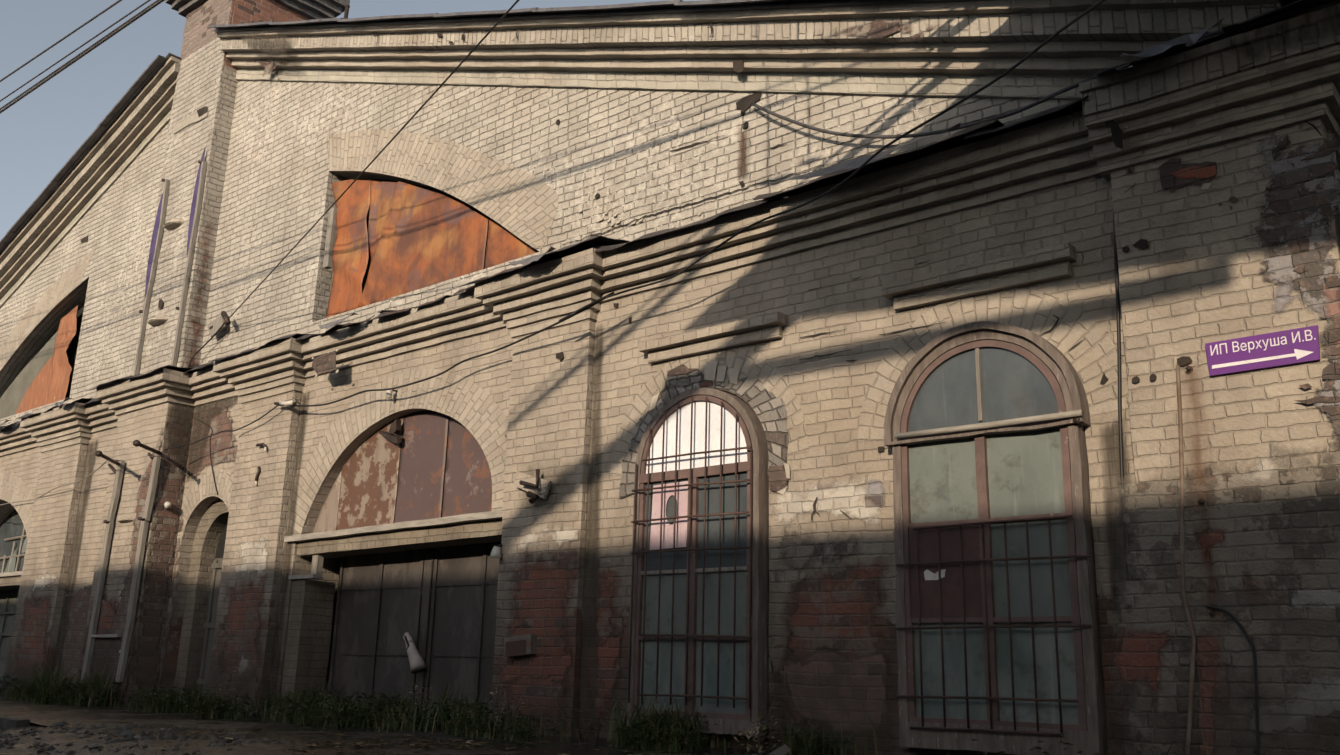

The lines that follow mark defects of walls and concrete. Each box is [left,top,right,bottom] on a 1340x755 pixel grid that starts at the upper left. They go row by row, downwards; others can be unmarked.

peeling [80,406,237,705]
peeling [1114,132,1340,755]